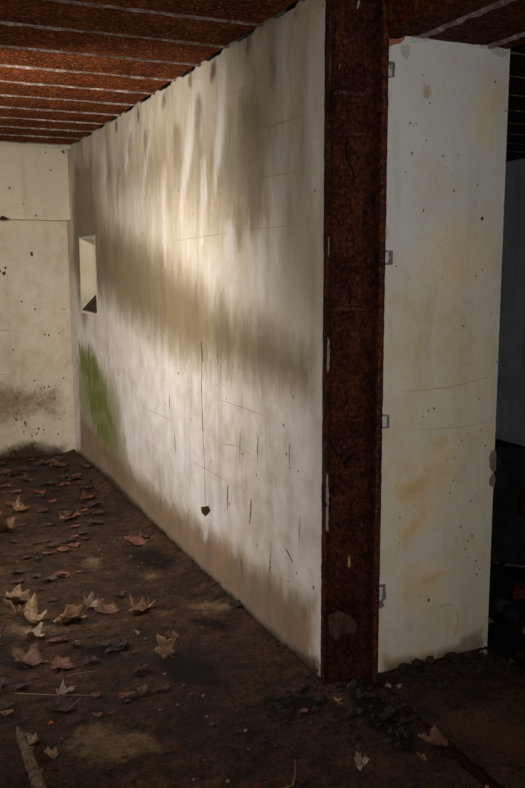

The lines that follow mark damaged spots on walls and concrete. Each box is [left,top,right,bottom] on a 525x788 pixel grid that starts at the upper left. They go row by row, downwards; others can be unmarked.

damp [145,68,261,258]
damp [308,23,325,142]
damp [73,165,309,389]
damp [79,343,121,463]